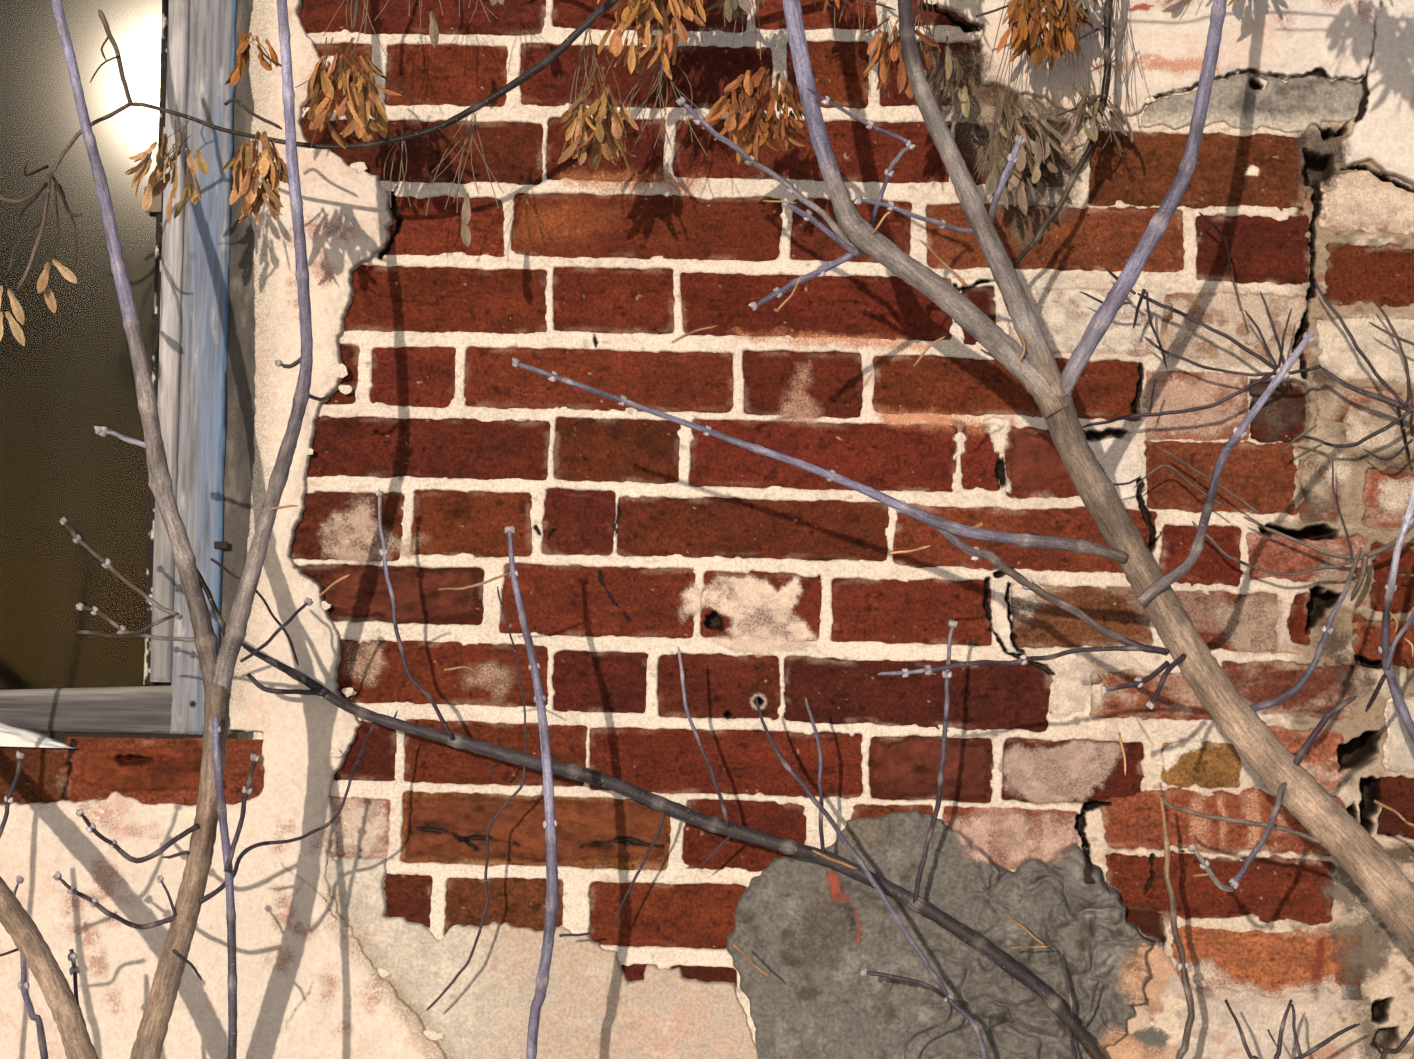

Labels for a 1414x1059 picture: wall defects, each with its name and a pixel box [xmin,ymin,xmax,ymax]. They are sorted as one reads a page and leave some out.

spalling [924,0,1369,127]
crack [1328,2,1382,122]
spalling [984,417,1069,492]
spalling [1085,428,1126,441]
crack [1136,478,1161,552]
spalling [285,94,478,1059]
peeling [682,576,817,656]
crack [982,567,1055,675]
spalling [1305,586,1383,693]
spalling [406,797,669,862]
spalling [872,735,991,798]
spalling [1337,731,1379,834]